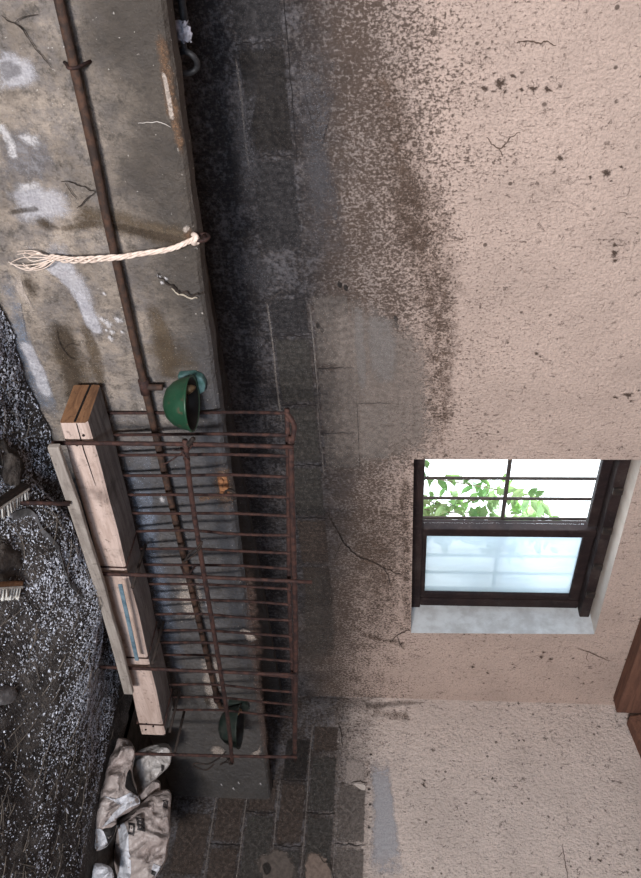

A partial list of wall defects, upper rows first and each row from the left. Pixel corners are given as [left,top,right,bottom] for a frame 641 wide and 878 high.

crack [2,14,52,68]
crack [517,39,556,47]
rust [157,39,183,149]
crack [487,132,521,157]
crack [61,181,96,208]
water stain [372,76,453,429]
crack [328,515,402,583]
water stain [357,481,410,618]